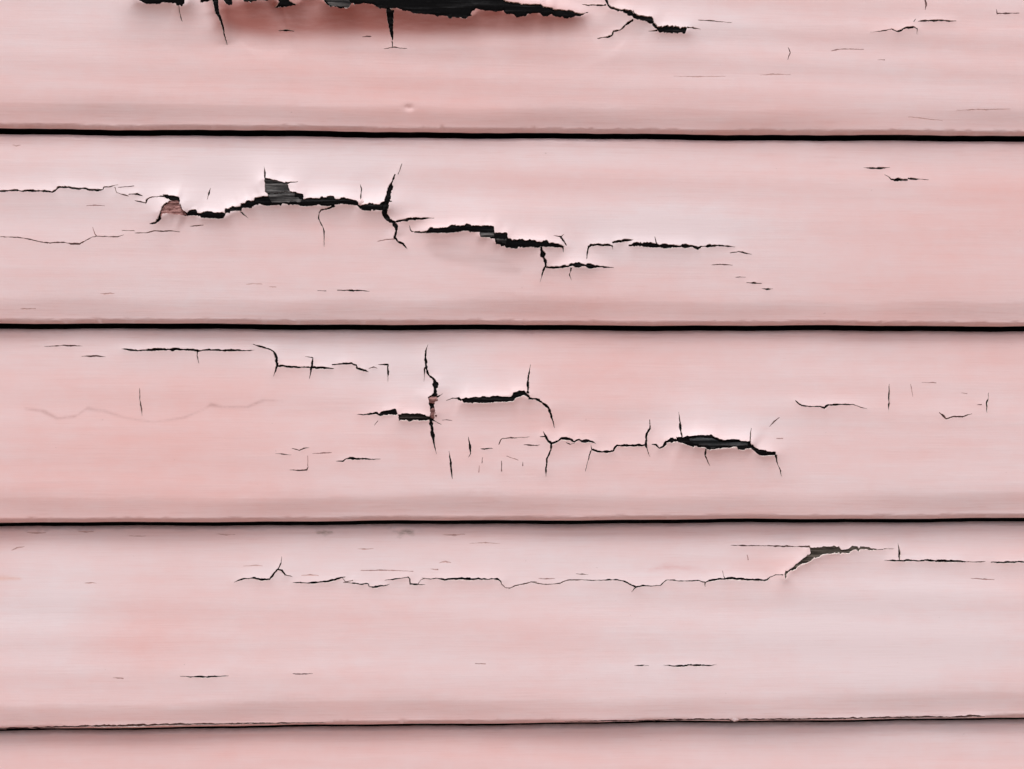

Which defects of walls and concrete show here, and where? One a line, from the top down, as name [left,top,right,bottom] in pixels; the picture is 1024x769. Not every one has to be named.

peeling [140,0,185,22]
peeling [243,0,296,8]
peeling [324,0,588,49]
peeling [150,194,188,224]
crack [0,164,770,290]
crack [45,344,389,379]
crack [357,345,936,479]
crack [939,393,989,420]
crack [276,447,376,471]
crack [235,557,783,591]
crack [885,545,1024,580]